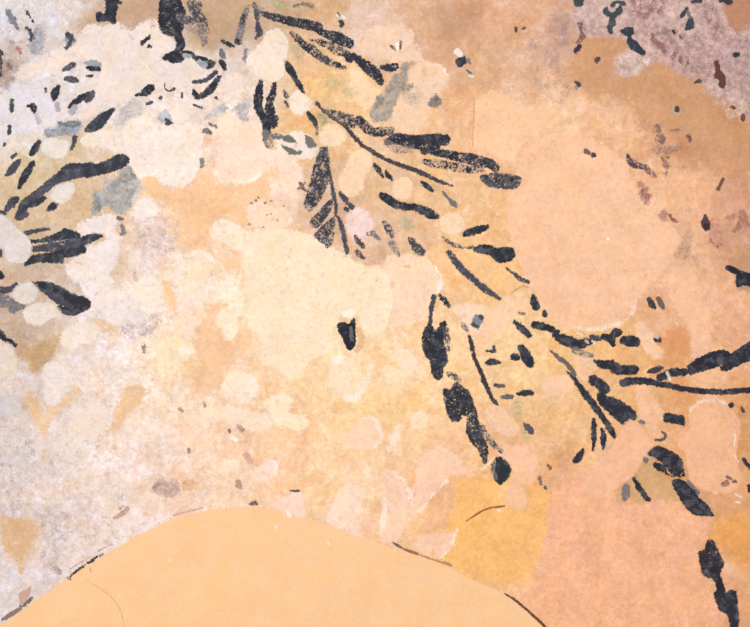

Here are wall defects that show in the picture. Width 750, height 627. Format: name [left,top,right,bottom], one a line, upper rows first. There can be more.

flaking render [72,0,160,34]
flaking render [194,0,260,50]
flaking render [143,175,274,250]
flaking render [189,295,254,408]
peeling [337,308,365,353]
crack [465,505,505,521]